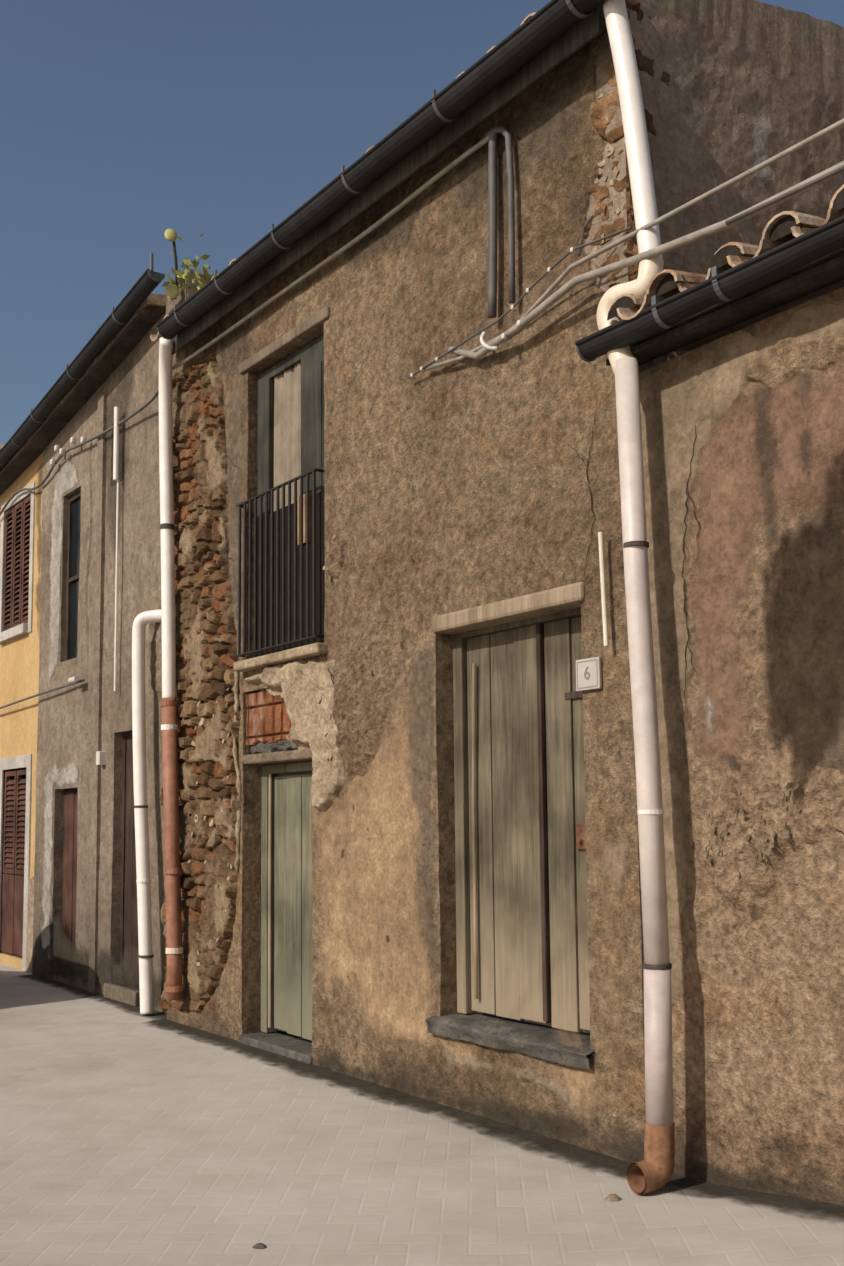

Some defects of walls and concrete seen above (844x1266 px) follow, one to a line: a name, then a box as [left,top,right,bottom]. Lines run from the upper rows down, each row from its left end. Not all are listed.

spalling [582,53,639,288]
flaking render [625,0,670,86]
flaking render [644,109,656,136]
flaking render [148,353,403,1014]
crack [681,425,700,728]
peeling [691,332,844,934]